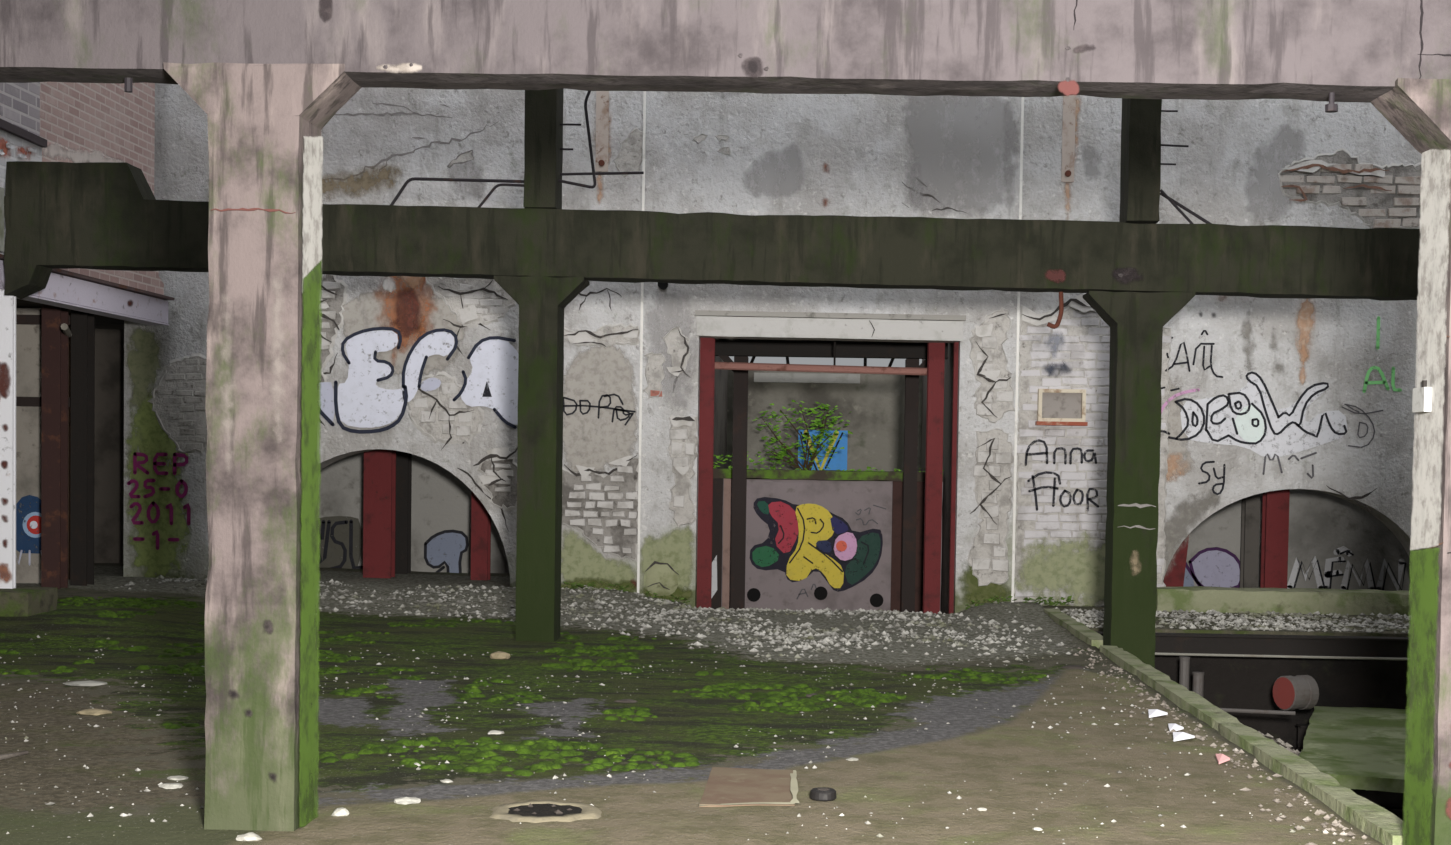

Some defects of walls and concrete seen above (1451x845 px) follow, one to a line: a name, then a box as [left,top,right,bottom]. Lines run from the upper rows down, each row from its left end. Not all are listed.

peeling [1277,148,1422,229]
rust [0,363,10,398]
rust [376,276,433,357]
peeling [564,323,691,399]
crack [970,298,1092,524]
rust [1297,299,1314,383]
peeling [562,455,639,562]
peeling [667,415,698,528]